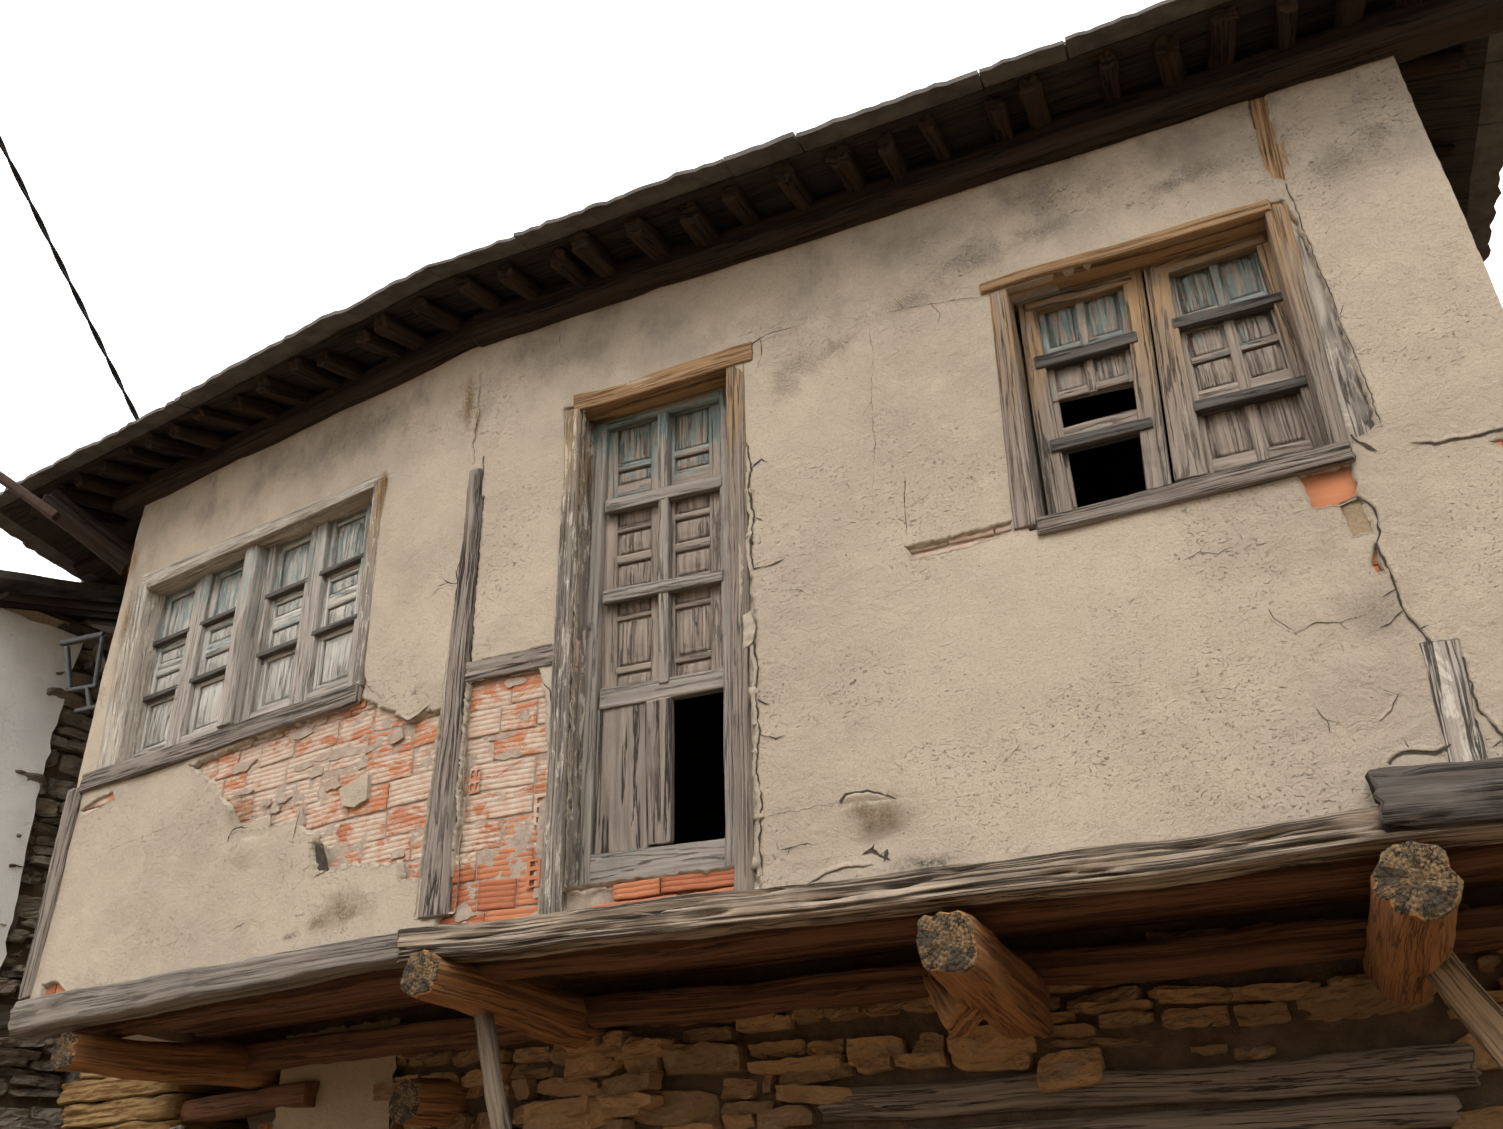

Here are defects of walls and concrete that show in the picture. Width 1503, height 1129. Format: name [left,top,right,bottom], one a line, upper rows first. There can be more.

spalling [1270,199,1381,444]
crack [1285,183,1503,451]
spalling [80,791,115,817]
spalling [187,595,553,926]
spalling [562,406,764,908]
crack [746,446,805,593]
crack [750,640,909,884]
spalling [1296,463,1386,575]
crack [1266,494,1503,747]
crack [1377,689,1451,765]